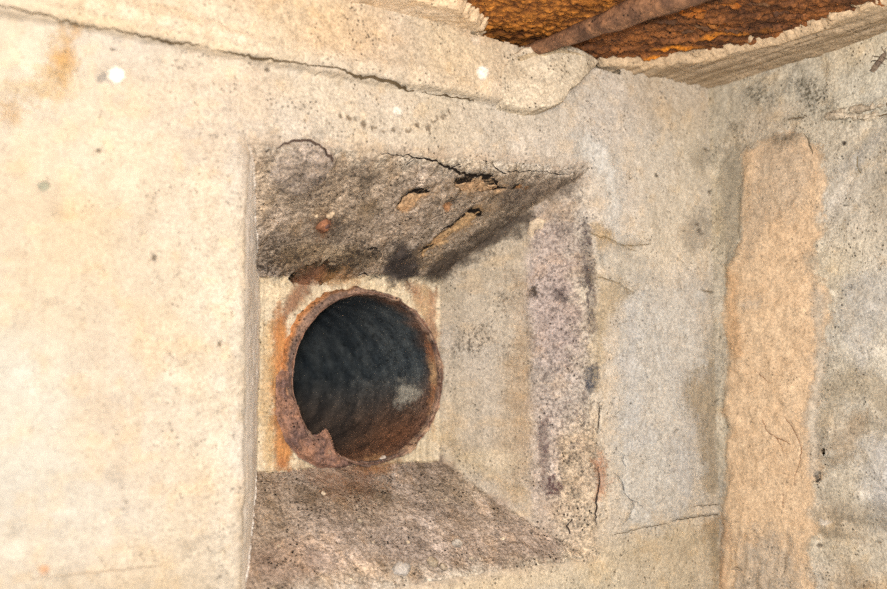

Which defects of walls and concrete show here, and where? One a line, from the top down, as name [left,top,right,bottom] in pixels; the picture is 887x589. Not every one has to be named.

crack [0,5,474,101]
corrosion [524,0,742,55]
spalling [397,188,430,212]
spalling [419,205,496,257]
spalling [453,177,503,195]
leakage [583,223,597,333]
corrosion [271,270,324,469]
leakage [585,363,599,390]
leakage [539,418,563,494]
crack [594,455,719,535]